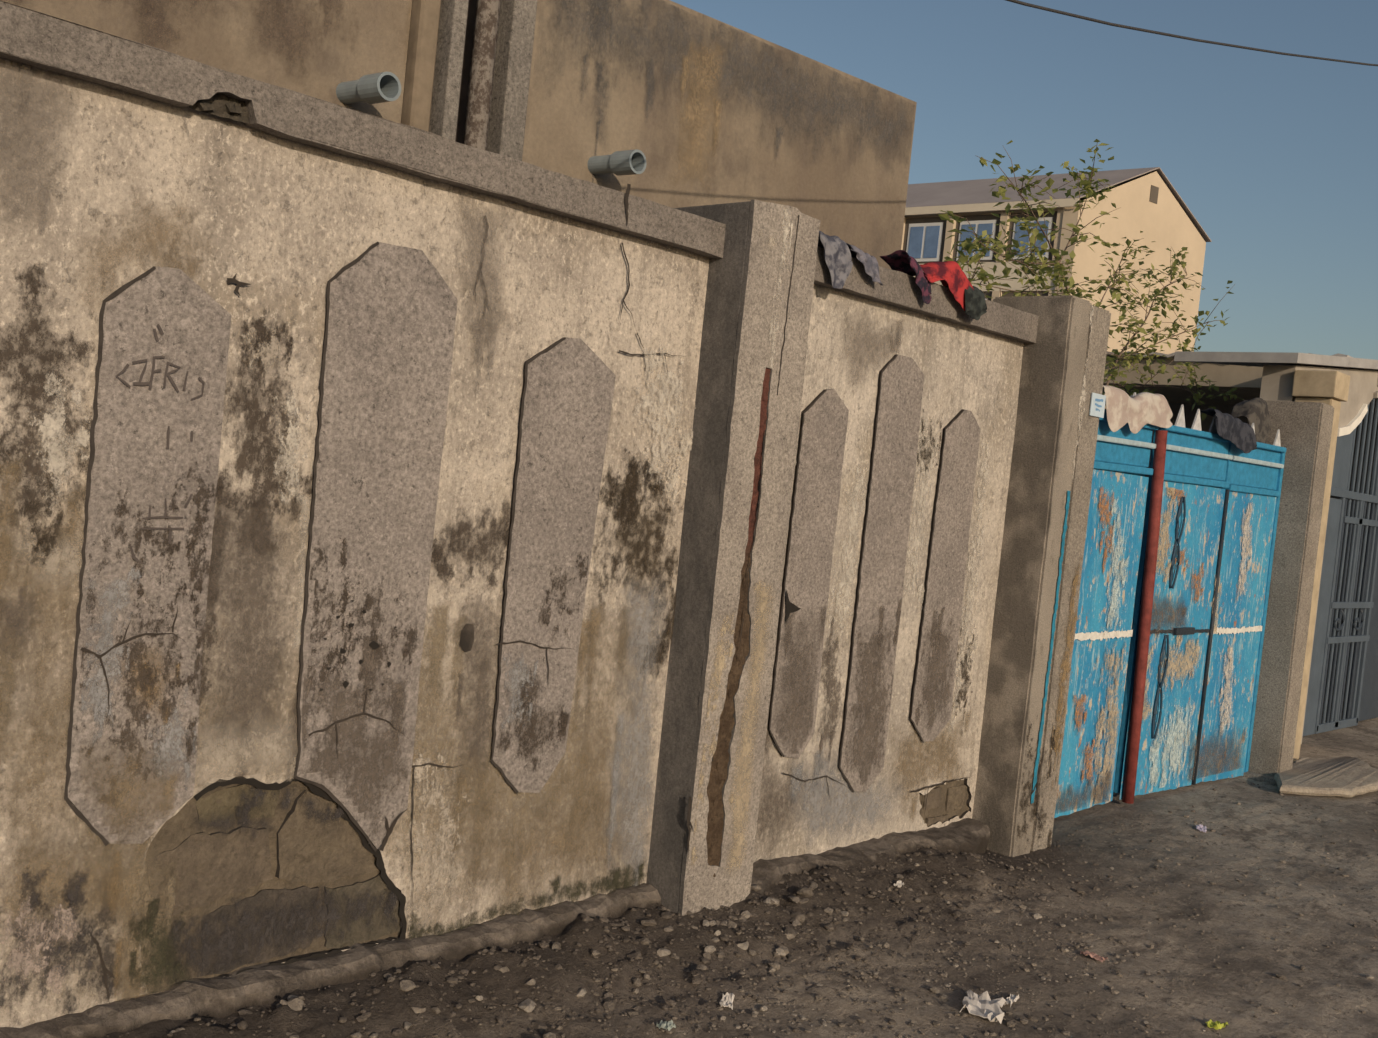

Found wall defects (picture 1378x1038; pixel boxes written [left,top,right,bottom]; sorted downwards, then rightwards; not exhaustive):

spalling [189,93,250,124]
leakage [556,0,906,171]
crack [619,184,686,390]
crack [81,607,184,720]
leakage [0,265,679,1014]
crack [496,640,576,687]
crack [738,430,766,654]
peeling [1091,497,1129,804]
peeling [1142,487,1253,788]
flaking render [136,730,474,994]
crack [309,687,461,905]
flaking render [919,778,969,827]